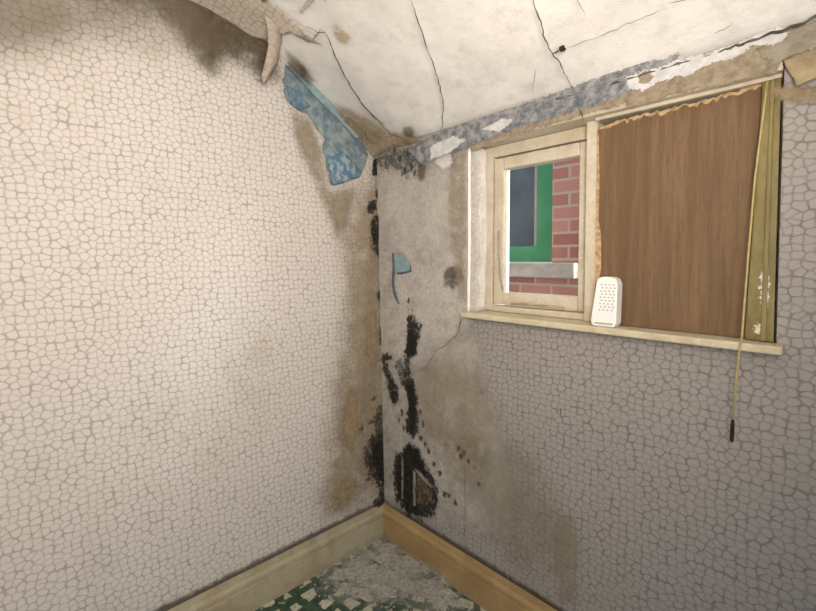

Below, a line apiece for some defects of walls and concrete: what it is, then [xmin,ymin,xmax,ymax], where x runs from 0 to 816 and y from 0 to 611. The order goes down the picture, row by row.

damp [153,0,268,70]
peeling [282,65,368,185]
damp [335,27,349,43]
crack [306,26,410,146]
crack [411,1,444,129]
flaking render [429,20,816,160]
damp [295,107,507,532]
peeling [392,253,412,304]